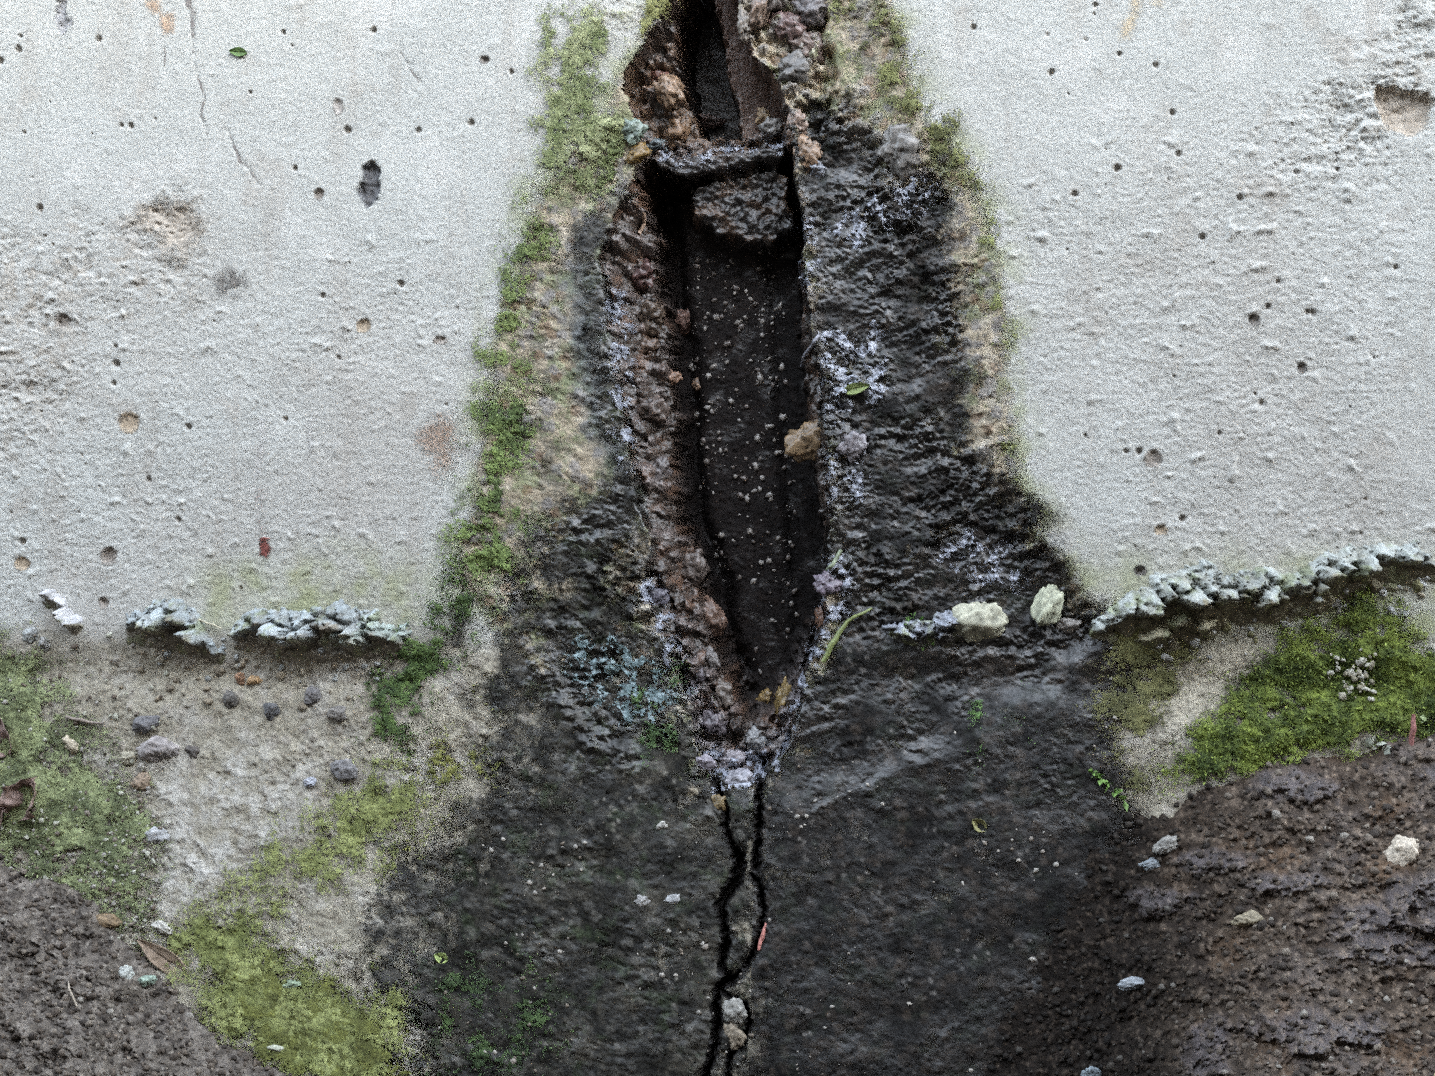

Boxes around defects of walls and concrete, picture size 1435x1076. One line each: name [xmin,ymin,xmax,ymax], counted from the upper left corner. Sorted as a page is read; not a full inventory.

crack [701,756,768,1076]
leakage [337,86,1157,1076]
spalling [456,0,1103,815]